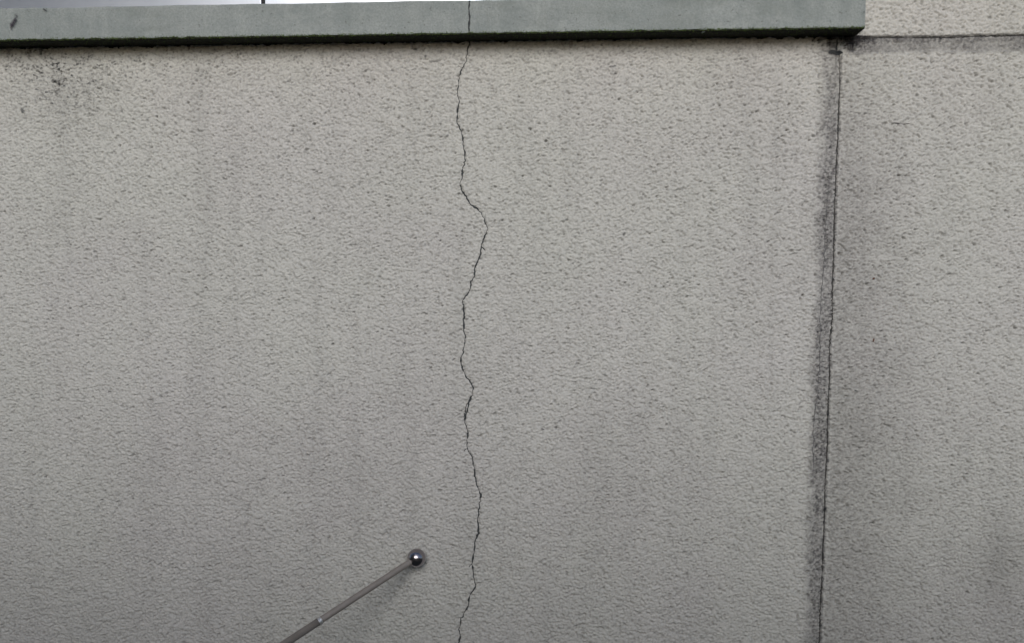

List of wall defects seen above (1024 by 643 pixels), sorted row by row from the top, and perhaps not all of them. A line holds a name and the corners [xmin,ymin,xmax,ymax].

crack [456,0,488,643]